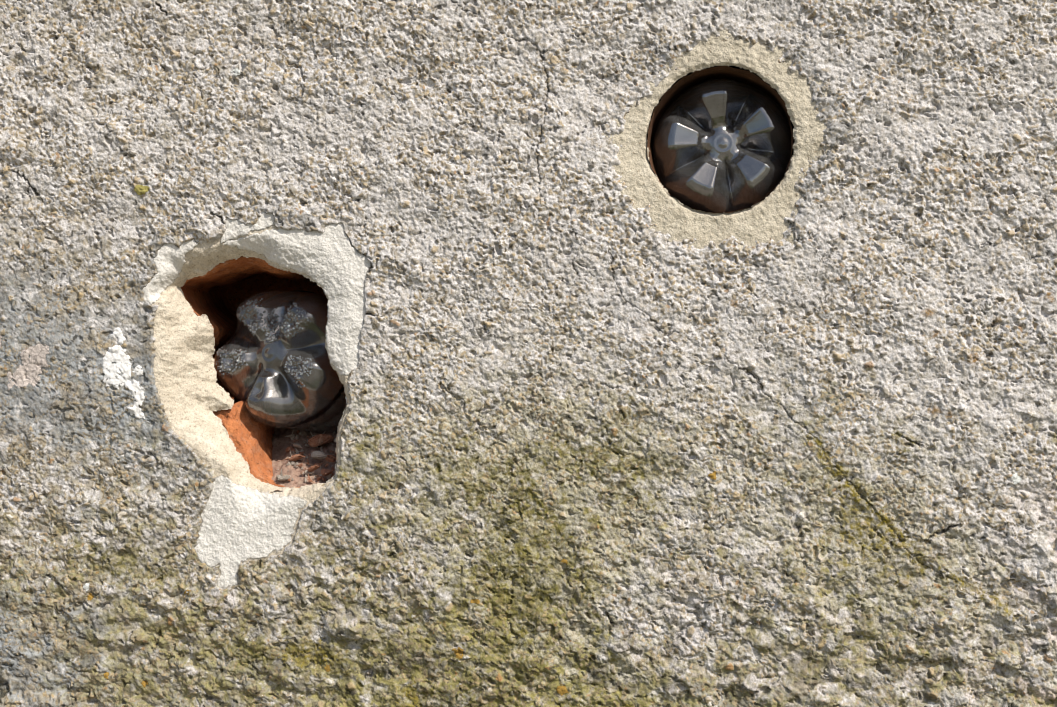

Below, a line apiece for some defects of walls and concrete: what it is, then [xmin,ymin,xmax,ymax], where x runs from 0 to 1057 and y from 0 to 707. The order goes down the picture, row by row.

spalling [102,210,370,589]
crack [713,335,823,449]
water stain [804,432,1011,615]
crack [906,524,958,561]